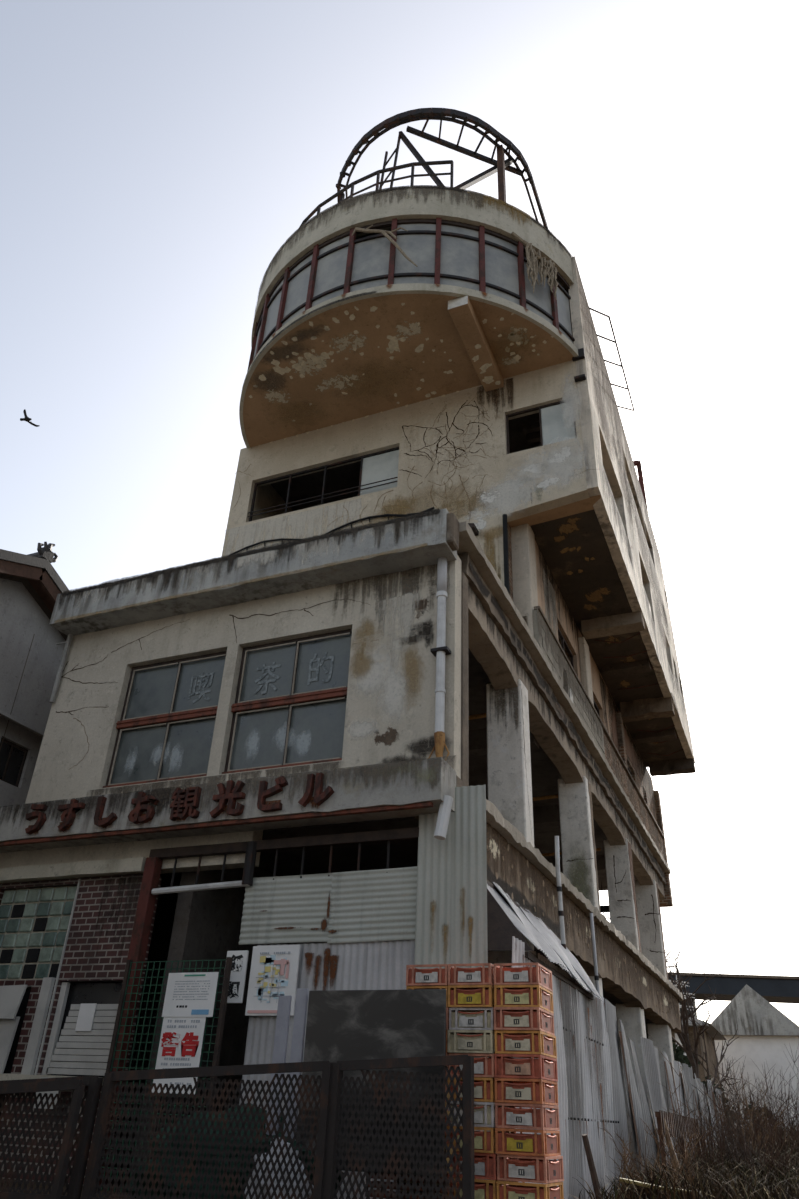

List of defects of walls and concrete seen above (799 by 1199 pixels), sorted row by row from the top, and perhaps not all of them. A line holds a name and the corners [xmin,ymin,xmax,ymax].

peeling [249,303,459,449]
peeling [472,313,553,385]
leakage [59,443,581,609]
crack [328,393,498,528]
leakage [241,185,685,716]
spalling [412,598,428,619]
spalling [374,727,399,746]
leakage [468,546,666,887]
rust [305,948,339,990]
rust [311,894,336,933]
rust [431,889,473,955]
leakage [486,822,680,1026]